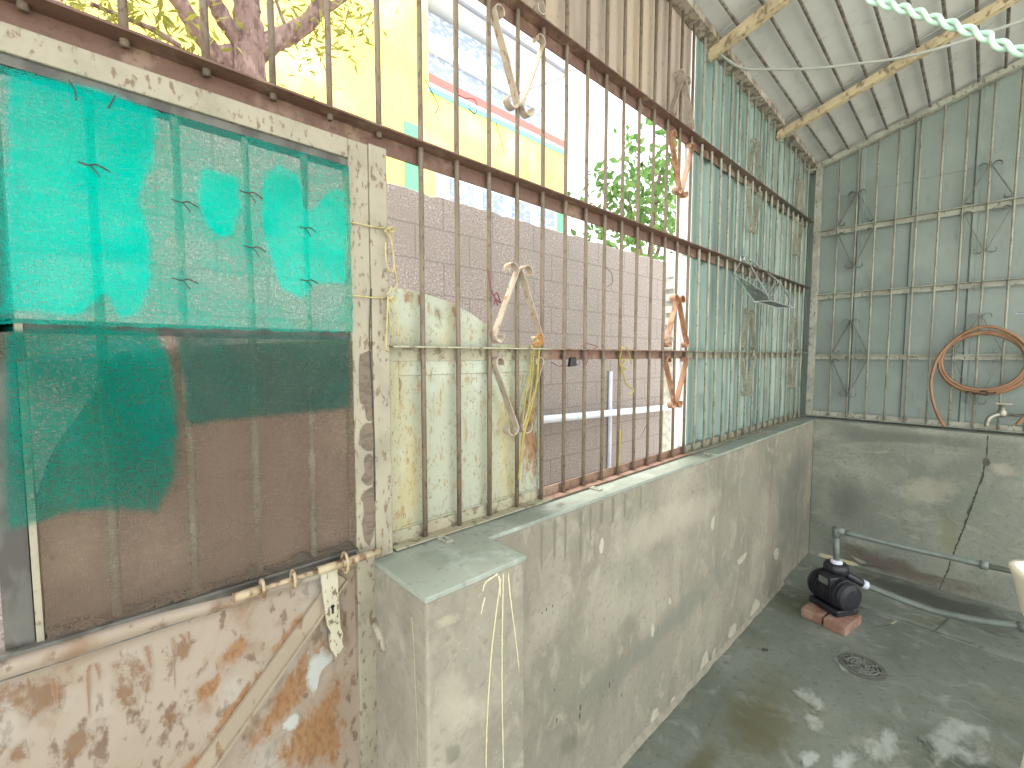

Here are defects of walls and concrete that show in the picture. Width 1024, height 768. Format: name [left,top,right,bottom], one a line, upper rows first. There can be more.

peeling [359,351,375,546]
crack [939,435,990,590]
rust [5,740,30,768]
rust [0,673,70,725]
rust [49,645,155,768]
rust [158,705,187,732]
rust [169,631,198,684]
rust [181,604,308,768]
rust [237,623,352,768]
peeling [305,646,334,700]
leakage [677,669,902,768]
leakage [914,715,999,768]